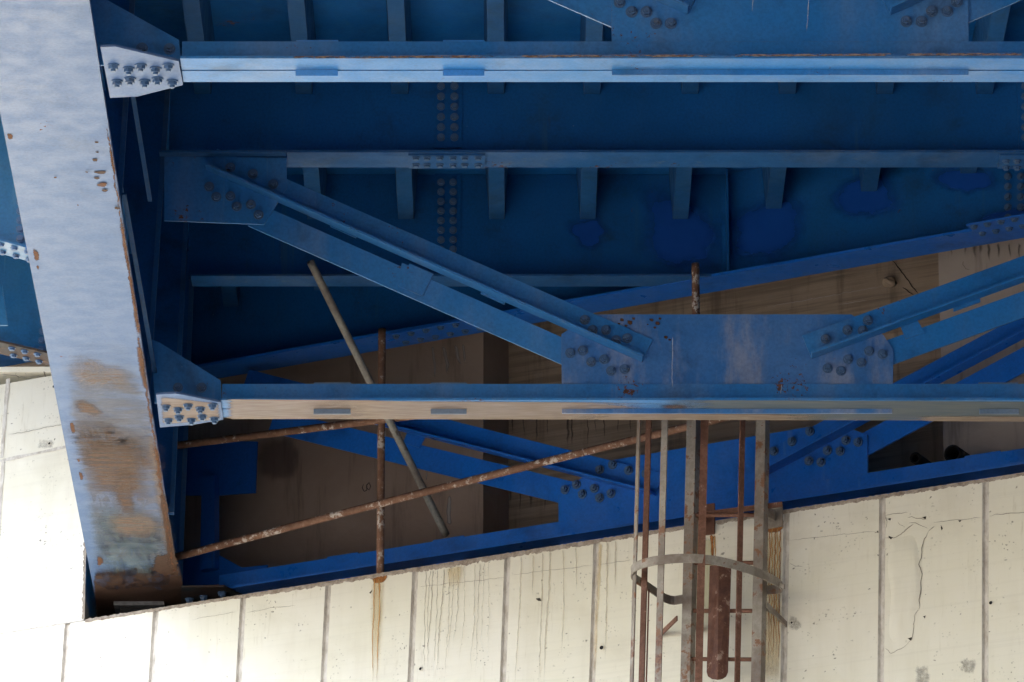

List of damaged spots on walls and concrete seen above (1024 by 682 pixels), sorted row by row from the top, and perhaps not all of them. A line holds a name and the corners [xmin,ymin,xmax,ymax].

corrosion [70,129,807,572]
corrosion [372,575,387,667]
water stain [423,564,490,653]
crack [799,512,1024,654]